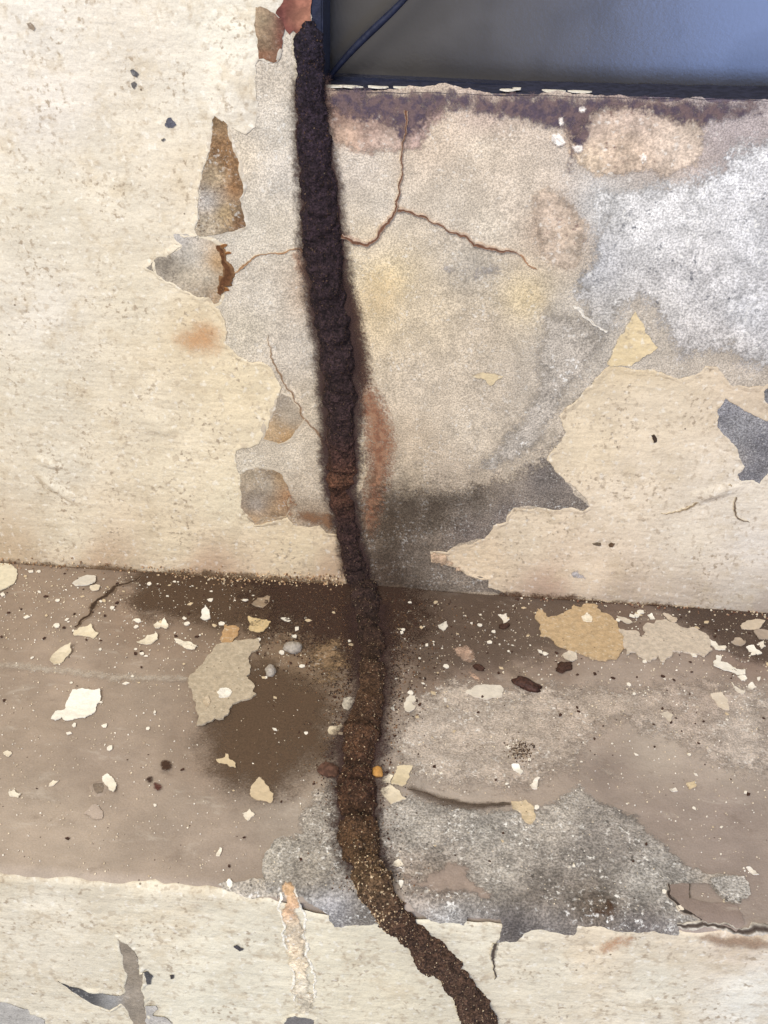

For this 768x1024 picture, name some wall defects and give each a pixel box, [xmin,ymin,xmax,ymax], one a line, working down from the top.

crack [341,110,537,270]
water stain [329,86,761,172]
peeling [142,0,337,537]
corrosion [349,293,396,533]
peeling [326,83,768,700]
corrosion [288,495,333,528]
crack [74,571,150,628]
water stain [124,571,285,642]
water stain [200,658,337,800]
spalling [218,777,378,928]
crack [407,788,511,809]
spalling [378,765,759,943]